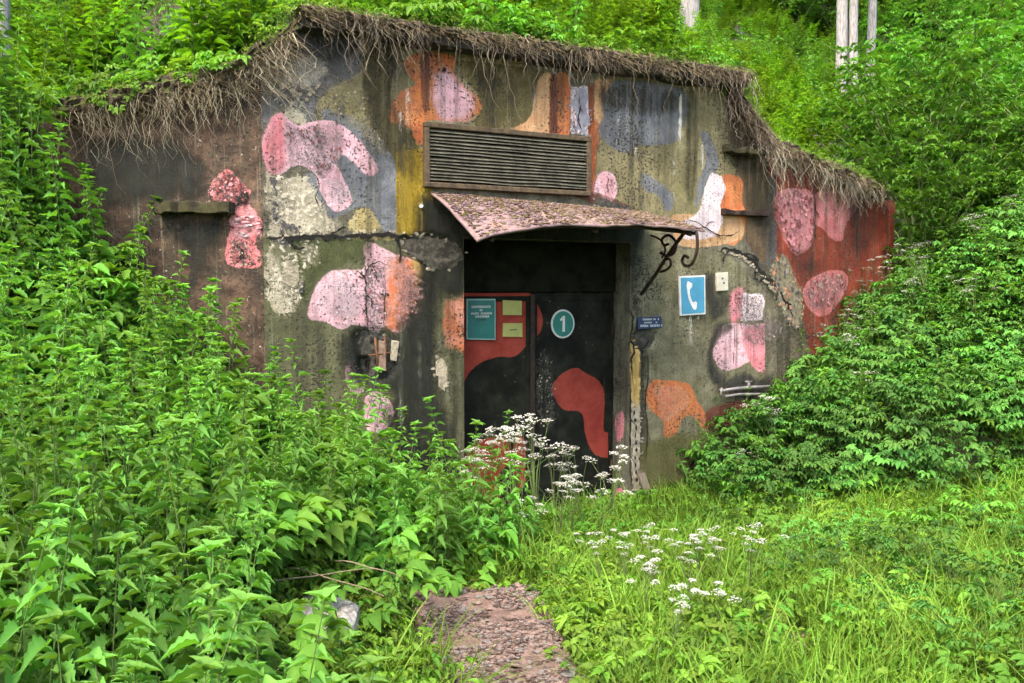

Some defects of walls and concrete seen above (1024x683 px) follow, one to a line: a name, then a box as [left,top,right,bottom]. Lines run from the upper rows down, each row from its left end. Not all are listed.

damp [79,136,205,204]
damp [175,215,222,285]
spalling [320,234,468,379]
crack [685,220,793,323]